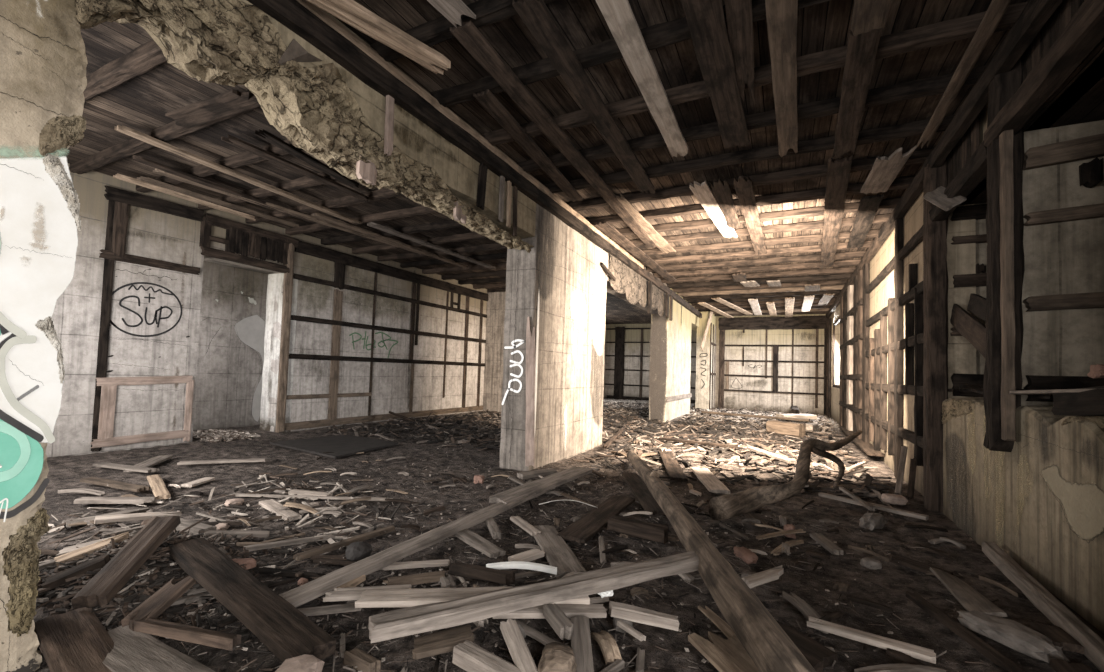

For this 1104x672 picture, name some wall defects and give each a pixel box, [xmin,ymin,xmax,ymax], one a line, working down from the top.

spalling [78,0,534,253]